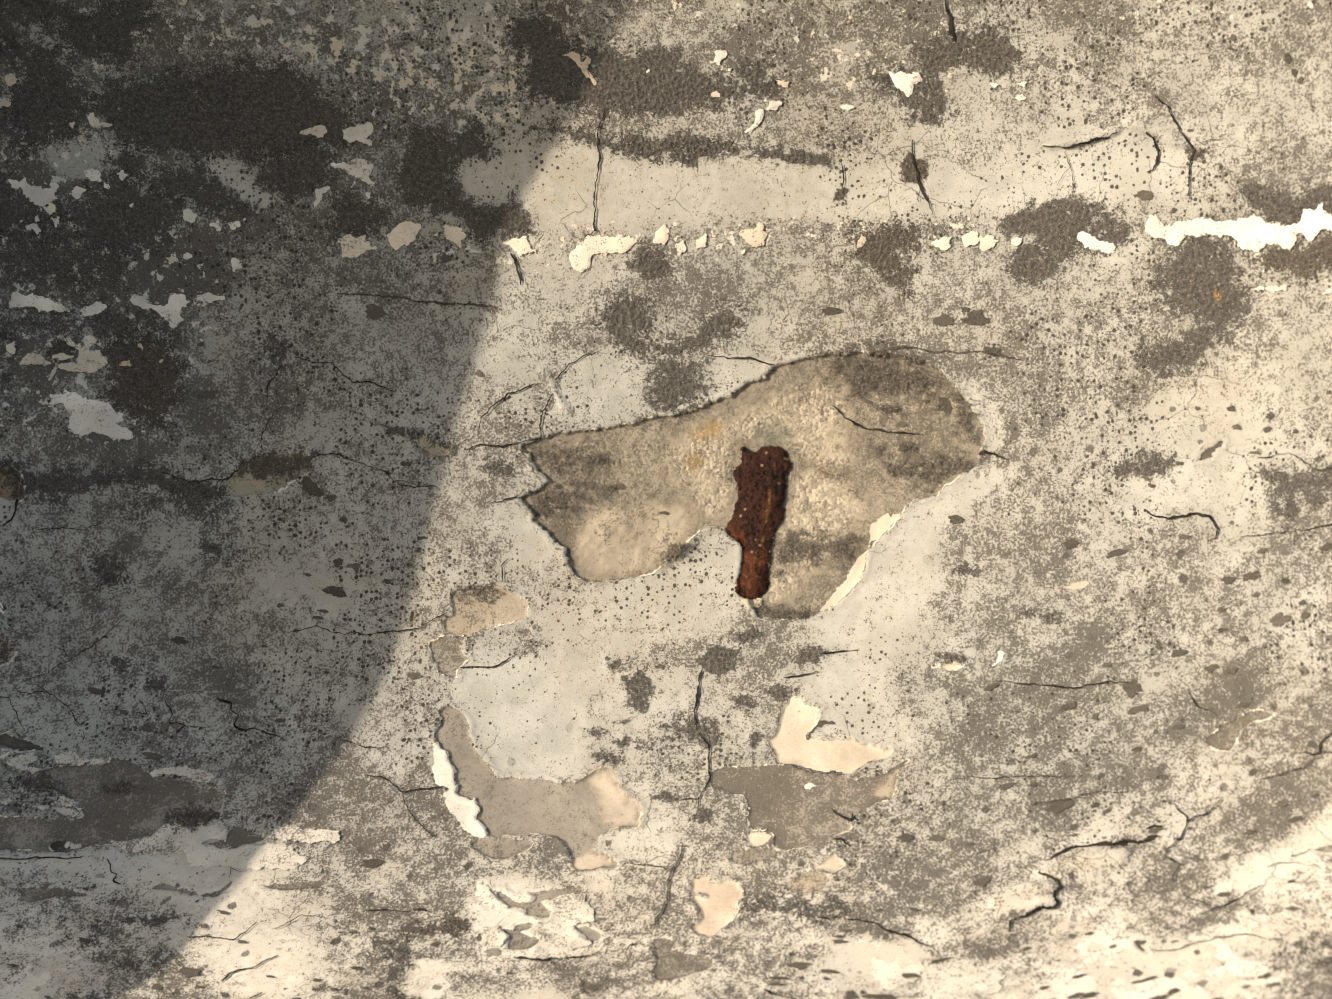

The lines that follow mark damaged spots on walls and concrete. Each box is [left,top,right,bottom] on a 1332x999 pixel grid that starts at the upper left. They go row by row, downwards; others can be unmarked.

damp [0,0,536,434]
crack [585,110,607,237]
peeling [569,235,637,272]
peeling [1133,190,1332,252]
crack [464,351,599,450]
peeling [517,336,987,625]
corrosion [726,445,792,608]
peeling [432,706,644,974]
crack [518,844,683,961]
crack [681,668,711,811]
peeling [709,695,910,894]
crack [1008,797,1318,951]